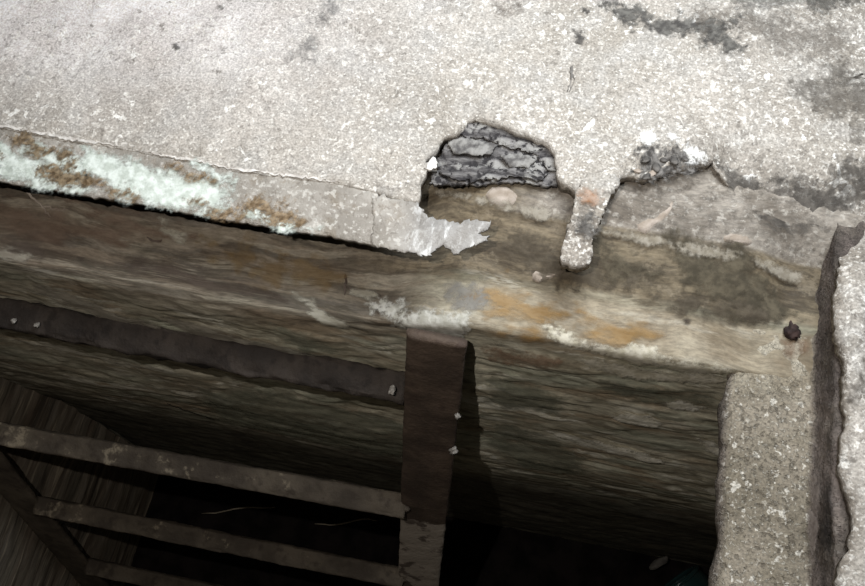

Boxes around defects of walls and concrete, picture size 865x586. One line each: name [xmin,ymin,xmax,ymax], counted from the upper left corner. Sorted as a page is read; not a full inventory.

leakage [599,0,748,52]
leakage [807,0,858,14]
leakage [790,63,865,113]
peeling [424,157,438,172]
spalling [630,131,707,185]
leakage [0,241,40,262]
leakage [131,257,348,328]